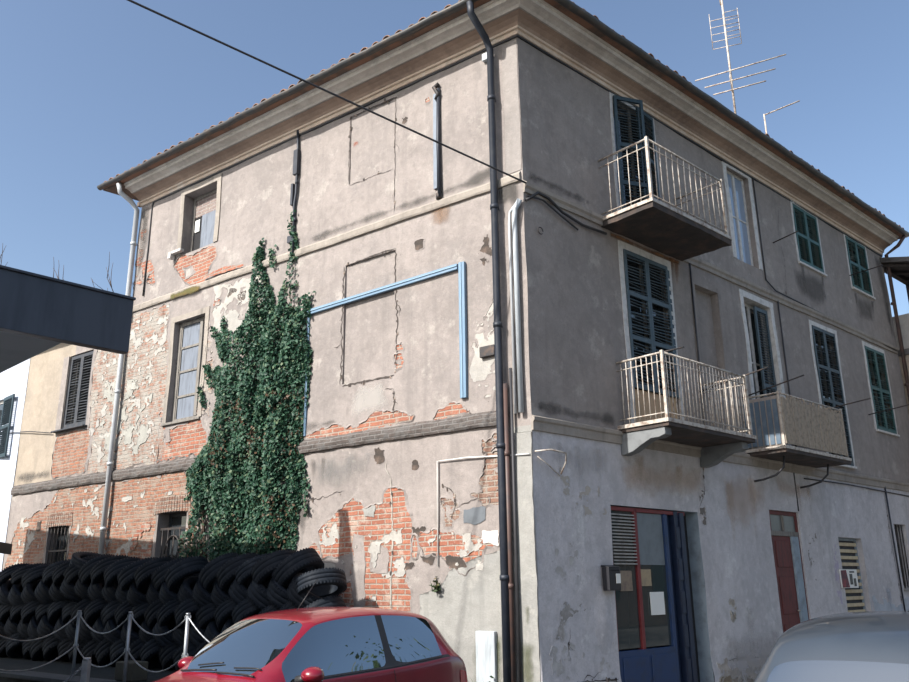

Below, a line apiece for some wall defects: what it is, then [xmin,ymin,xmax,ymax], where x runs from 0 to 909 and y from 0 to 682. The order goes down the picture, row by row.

crack [348,96,399,209]
flaking render [478,234,492,265]
crack [334,248,400,417]
flaking render [468,299,496,404]
flaking render [4,245,268,568]
flaking render [299,408,415,441]
flaking render [373,447,385,465]
flaking render [433,400,472,421]
flaking render [470,430,499,508]
flaking render [302,486,496,612]
crack [584,673,619,682]